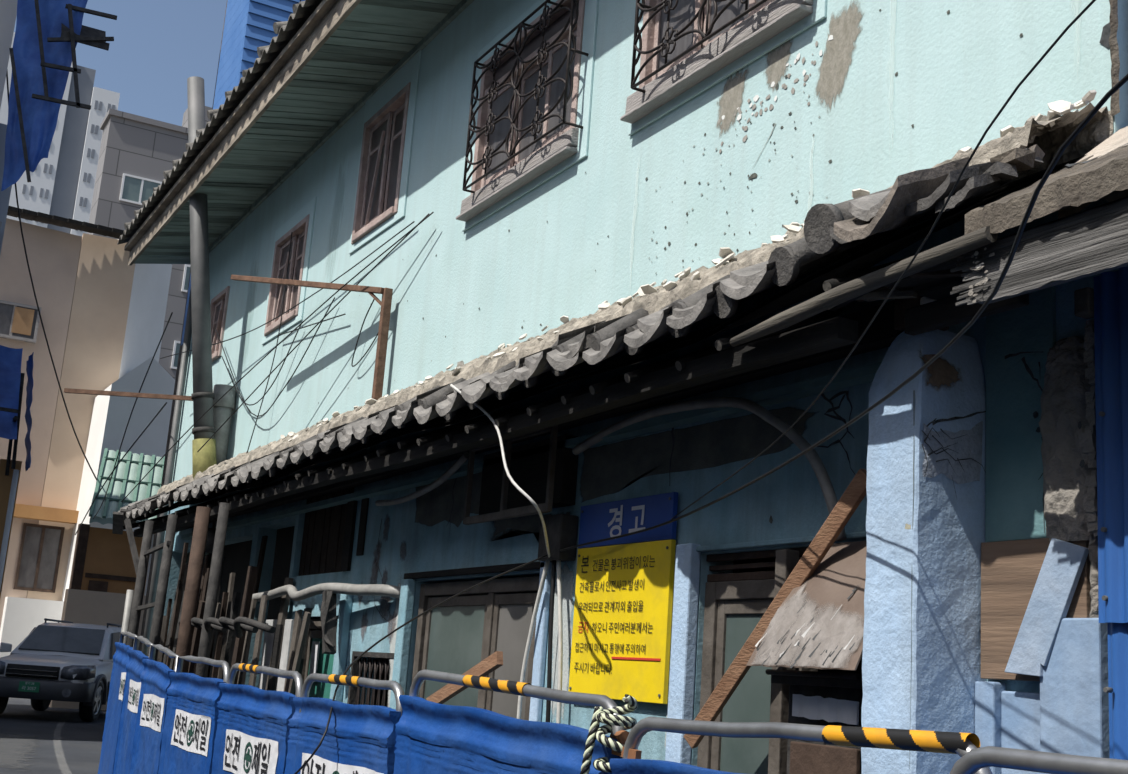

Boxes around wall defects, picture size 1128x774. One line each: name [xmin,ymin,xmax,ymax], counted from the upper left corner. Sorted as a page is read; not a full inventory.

peeling [676,35,833,199]
spalling [830,90,1113,244]
peeling [968,248,995,303]
spalling [157,211,817,502]
spalling [920,352,960,389]
peeling [415,472,482,527]
crack [817,390,856,475]
crack [912,390,986,530]
peeling [388,584,401,707]
crack [907,579,915,657]